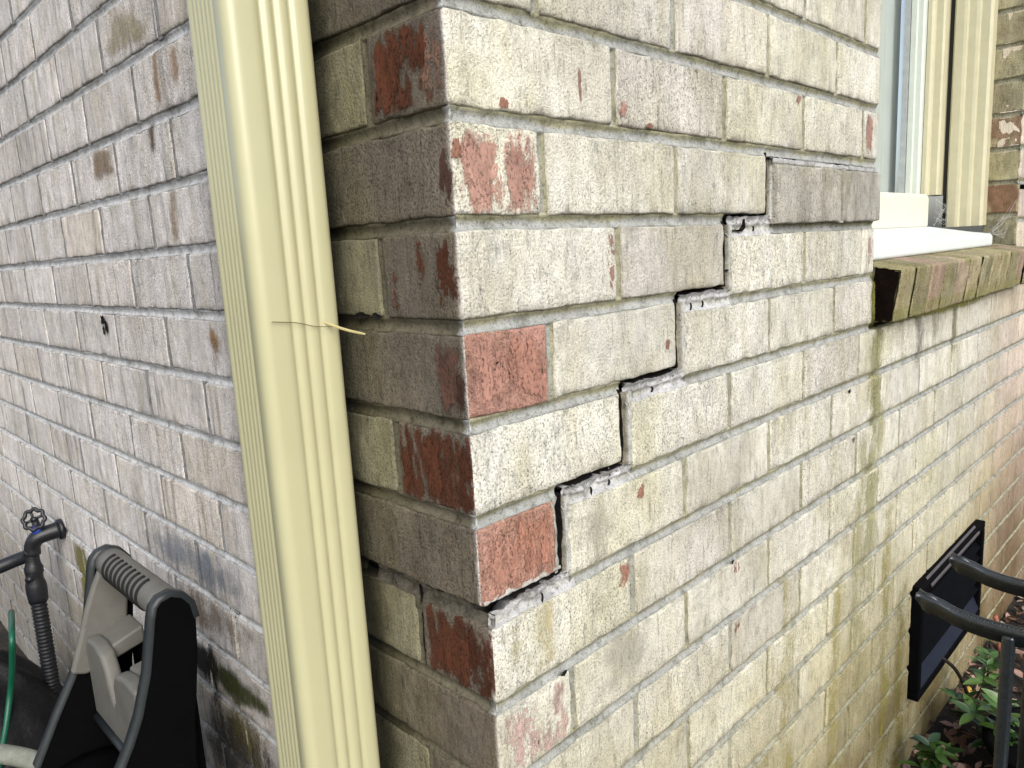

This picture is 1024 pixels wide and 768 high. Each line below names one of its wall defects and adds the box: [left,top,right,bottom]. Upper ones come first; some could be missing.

leakage [197,645,270,768]
crack [419,584,443,665]
crack [486,152,796,608]
leakage [830,282,904,768]